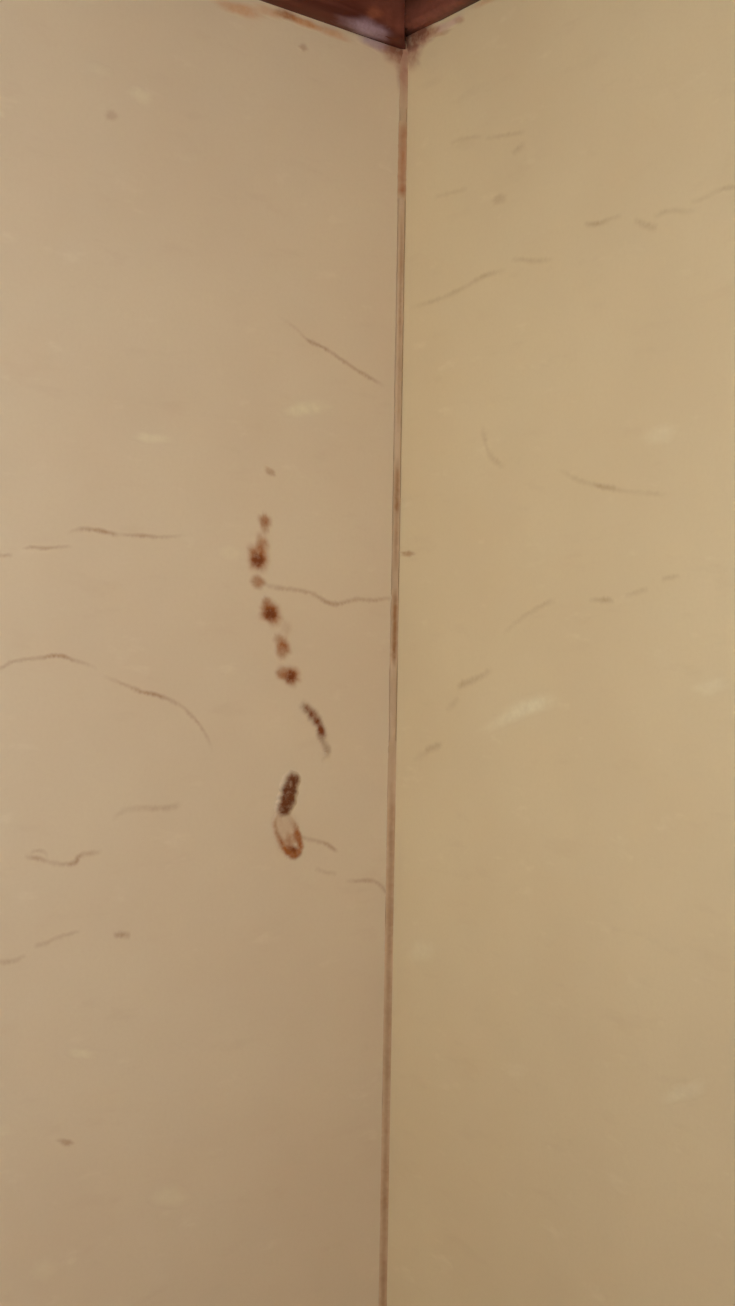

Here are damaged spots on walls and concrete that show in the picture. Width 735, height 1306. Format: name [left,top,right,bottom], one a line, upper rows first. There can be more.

crack [265,208,405,667]
crack [0,525,187,559]
rust [244,509,333,763]
crack [0,652,215,753]
crack [23,846,103,868]
rust [269,769,340,861]
crack [314,741,396,1306]